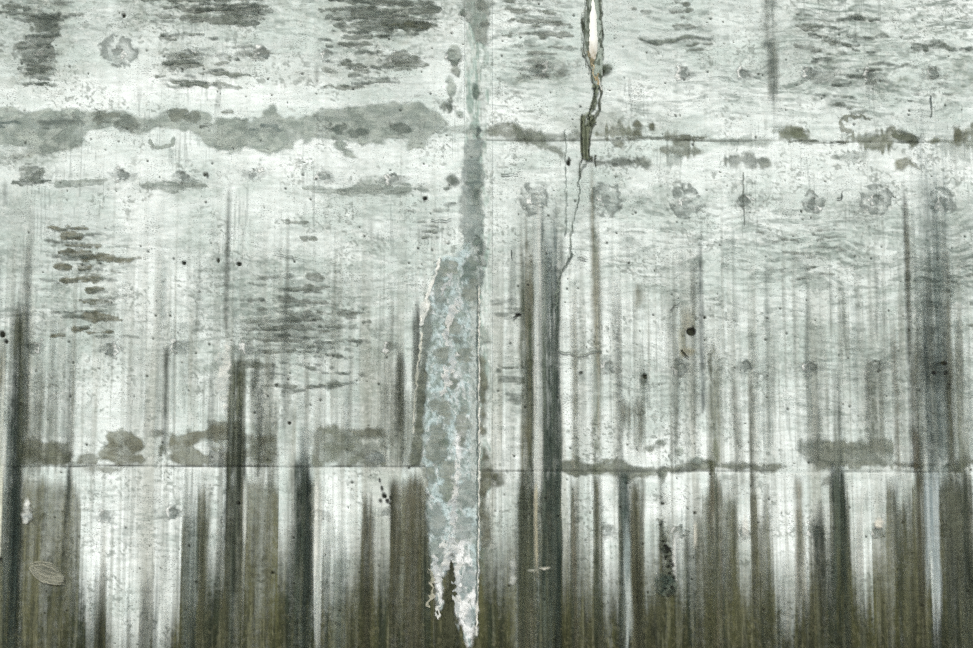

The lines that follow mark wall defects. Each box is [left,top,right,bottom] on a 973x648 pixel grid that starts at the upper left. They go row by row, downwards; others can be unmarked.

damp [459,0,494,44]
crack [554,0,611,311]
damp [779,114,919,153]
crack [558,348,602,356]